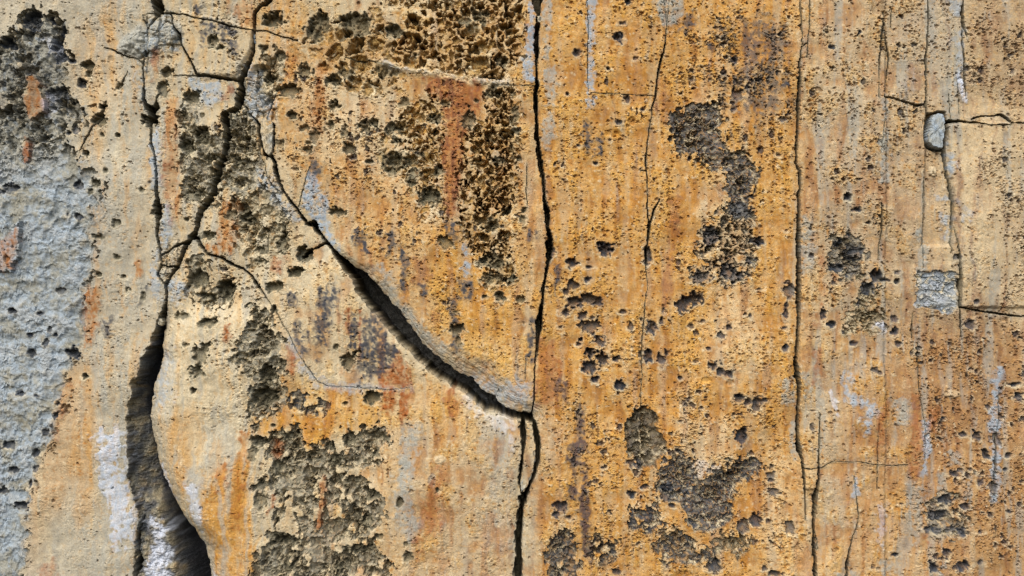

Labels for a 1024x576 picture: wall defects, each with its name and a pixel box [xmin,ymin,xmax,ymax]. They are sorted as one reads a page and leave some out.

spalling [0,6,124,576]
leakage [87,423,231,576]
corrosion [212,428,252,539]
spalling [156,64,416,576]
crack [78,0,555,576]
spalling [256,0,529,305]
corrosion [421,75,485,220]
corrosion [526,336,574,415]
crack [587,0,671,407]
spalling [617,85,766,380]
crack [793,0,927,576]
crack [878,0,1024,337]